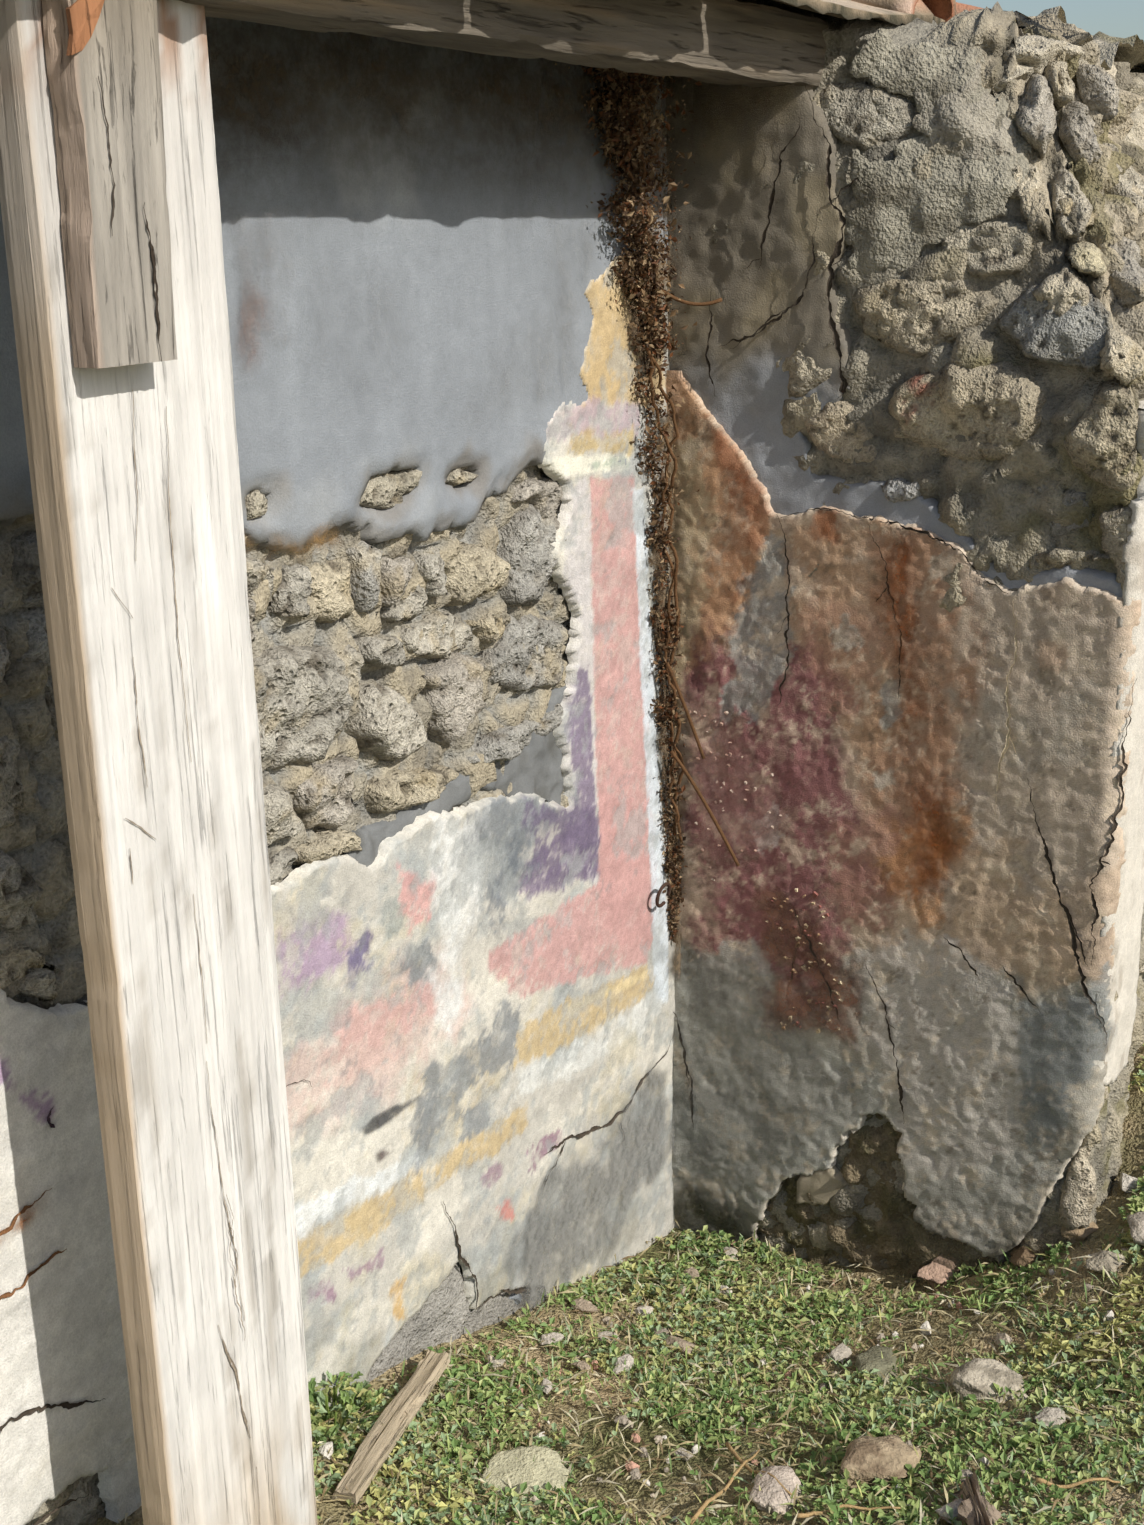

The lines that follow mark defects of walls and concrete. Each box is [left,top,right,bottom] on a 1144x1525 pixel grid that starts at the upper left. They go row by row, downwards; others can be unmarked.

crack [705,86,876,398]
crack [777,508,1137,1046]
crack [865,964,904,1124]
crack [0,1188,52,1236]
crack [0,1249,66,1300]
crack [444,1204,545,1312]
spalling [758,1113,998,1278]
crack [0,1398,104,1433]